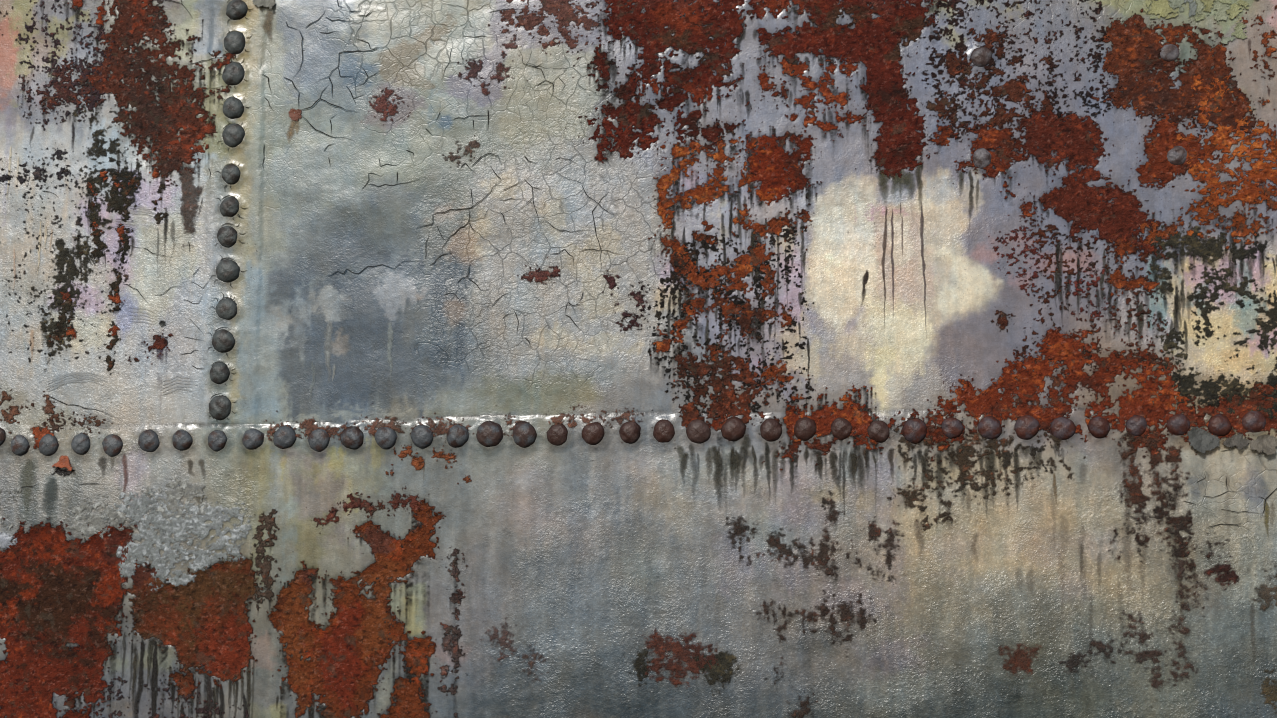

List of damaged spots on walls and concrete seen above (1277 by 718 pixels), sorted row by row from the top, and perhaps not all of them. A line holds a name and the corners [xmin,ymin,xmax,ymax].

rust [368,87,410,121]
crack [443,8,521,75]
crack [521,54,564,96]
peeling [1144,0,1249,44]
rust [0,0,235,375]
crack [328,110,617,344]
rust [457,0,1277,688]
rust [99,455,128,492]
rust [265,410,474,476]
peeling [0,487,21,549]
peeling [58,477,251,591]
rust [0,479,468,718]